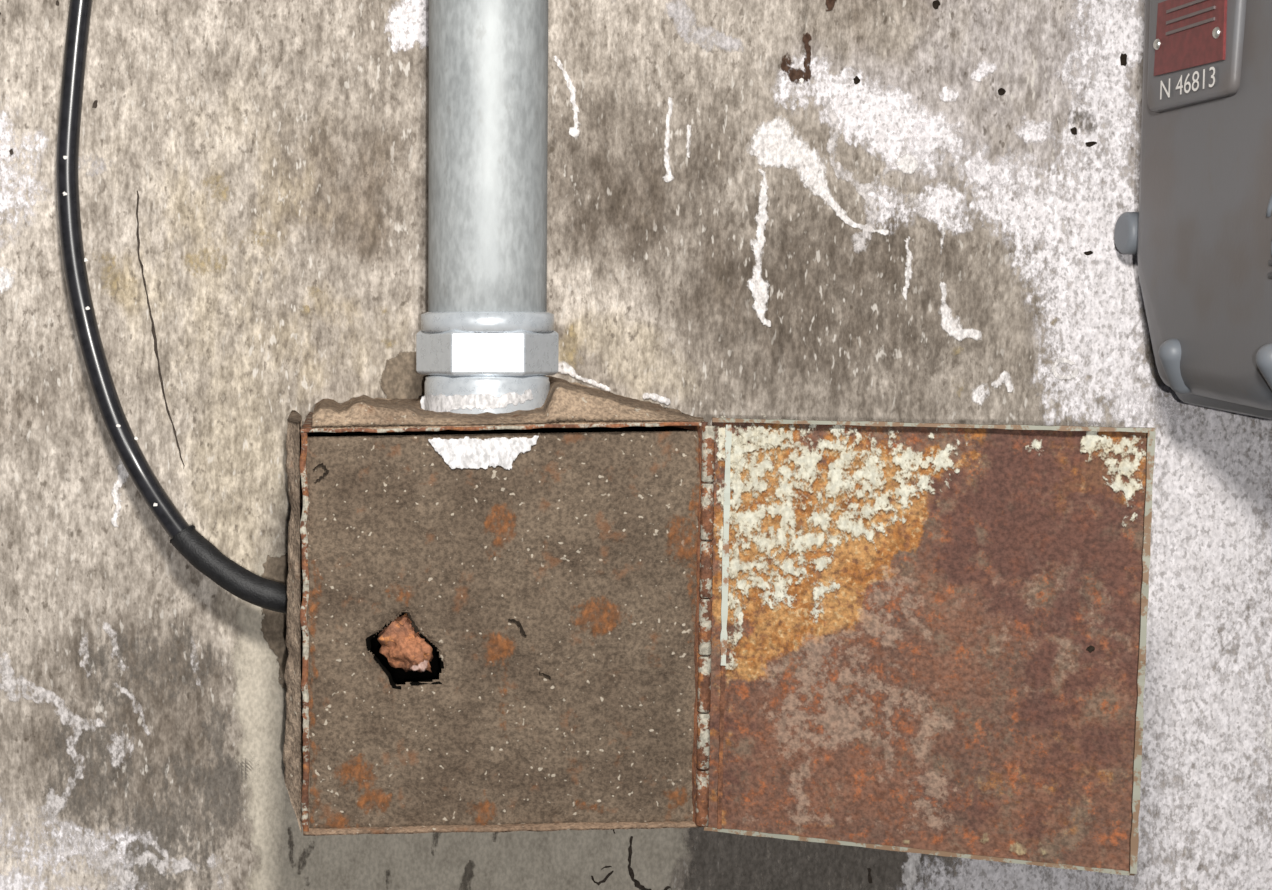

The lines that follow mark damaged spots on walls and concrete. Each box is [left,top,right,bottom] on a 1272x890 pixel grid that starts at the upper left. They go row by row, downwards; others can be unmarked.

rust [781,32,812,84]
water stain [685,0,1272,890]
spalling [366,612,444,690]